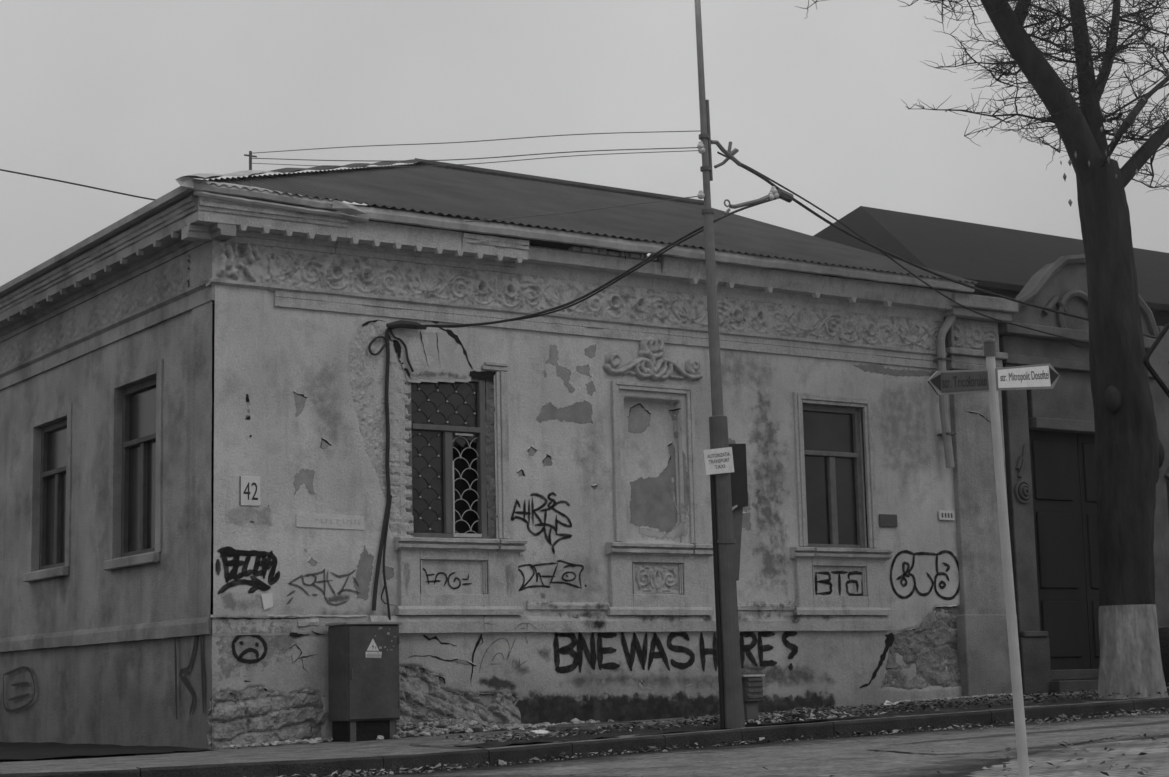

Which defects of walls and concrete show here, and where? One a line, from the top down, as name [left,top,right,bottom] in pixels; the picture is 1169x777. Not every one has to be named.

peeling [294,390,307,416]
peeling [293,468,315,495]
spalling [348,322,498,539]
peeling [537,343,597,424]
peeling [627,402,651,433]
peeling [630,408,689,540]
leakage [755,393,782,529]
spalling [881,605,961,690]
spalling [207,686,328,750]
spalling [396,665,521,732]